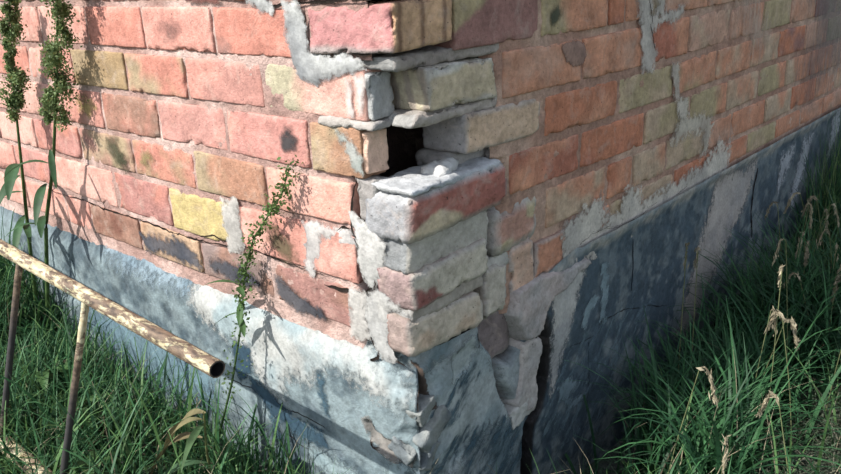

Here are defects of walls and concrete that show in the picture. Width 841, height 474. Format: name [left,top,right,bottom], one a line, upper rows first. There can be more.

crack [52,190,407,368]
peeling [88,246,591,474]
crack [337,177,359,251]
water stain [543,110,731,473]